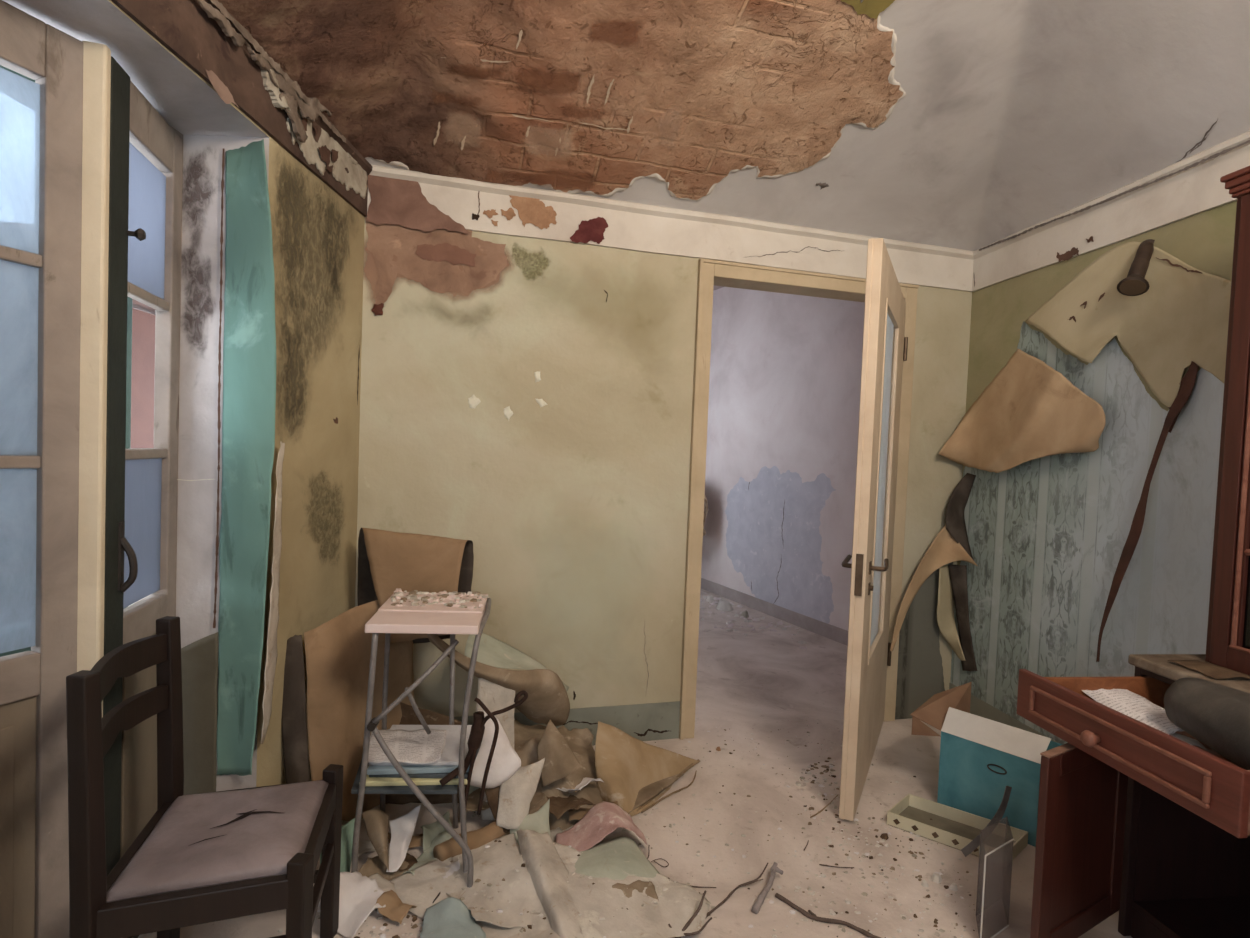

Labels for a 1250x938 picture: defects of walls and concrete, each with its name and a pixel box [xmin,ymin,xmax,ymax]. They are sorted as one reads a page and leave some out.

mould [182,155,213,350]
mould [276,167,347,429]
leakage [513,248,547,279]
flaking render [197,0,906,316]
crack [744,246,840,258]
flaking render [1056,236,1094,262]
crack [974,119,1250,287]
peeling [725,466,836,624]